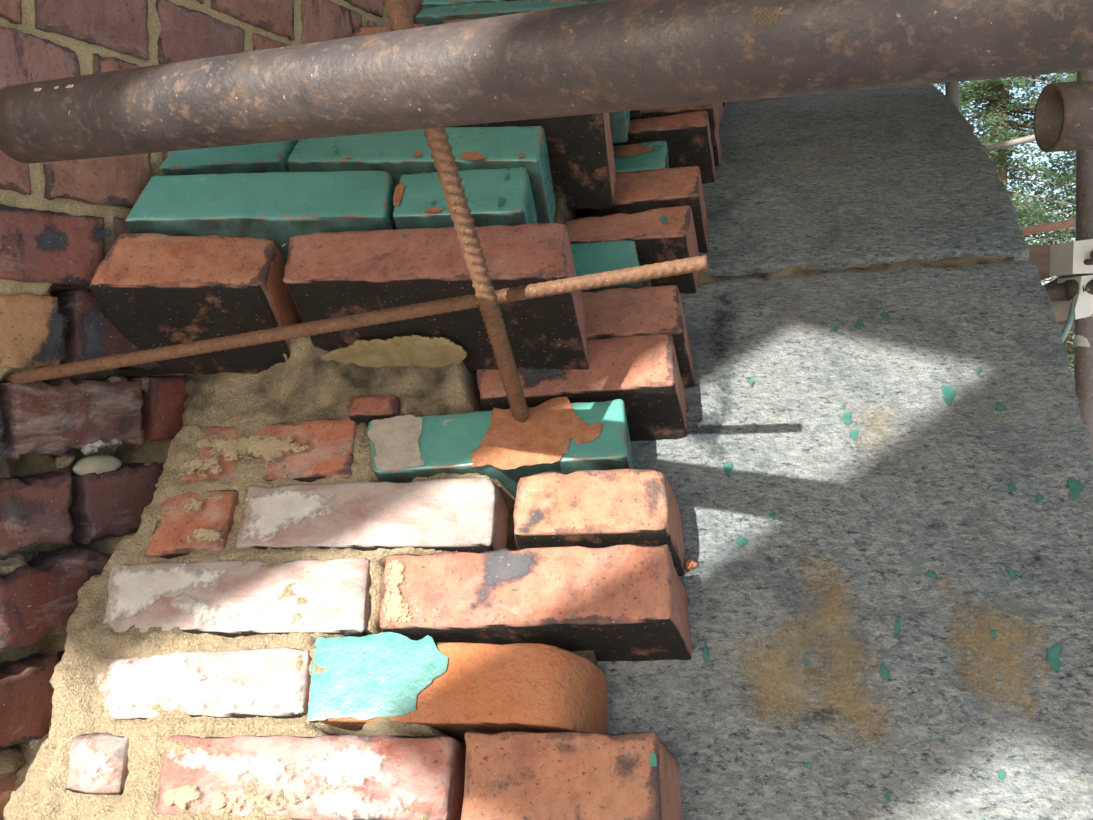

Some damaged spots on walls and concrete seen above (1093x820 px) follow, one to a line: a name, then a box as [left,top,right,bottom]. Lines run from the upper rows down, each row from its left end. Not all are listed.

water stain [242,488,333,541]
water stain [103,564,265,625]
water stain [106,653,302,713]
water stain [77,743,106,782]
water stain [170,751,288,783]
water stain [305,747,412,816]